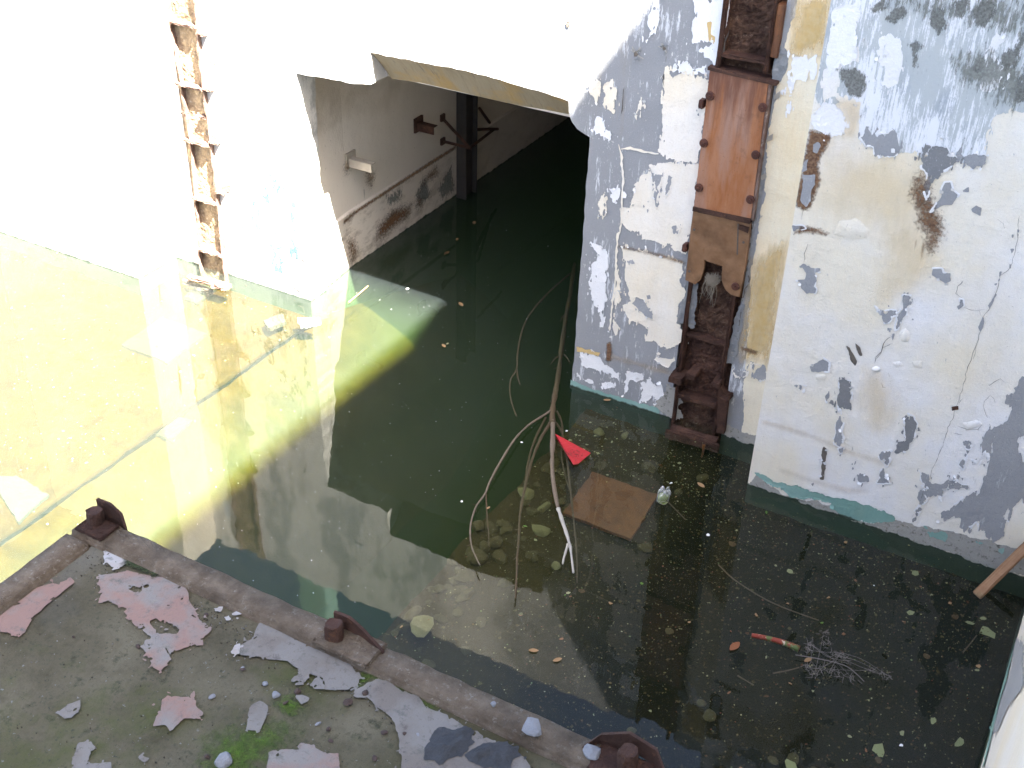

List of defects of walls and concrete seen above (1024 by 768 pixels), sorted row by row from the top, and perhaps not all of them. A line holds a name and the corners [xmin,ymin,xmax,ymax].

damp [794,0,826,53]
corrosion [344,146,456,239]
peeling [585,0,730,368]
damp [747,251,781,355]
corrosion [796,130,830,210]
peeling [726,0,1024,523]
corrosion [911,173,944,252]
crack [916,219,1019,515]
peeling [912,376,1024,554]
peeling [0,576,74,637]
peeling [94,551,242,673]
peeling [231,623,530,768]